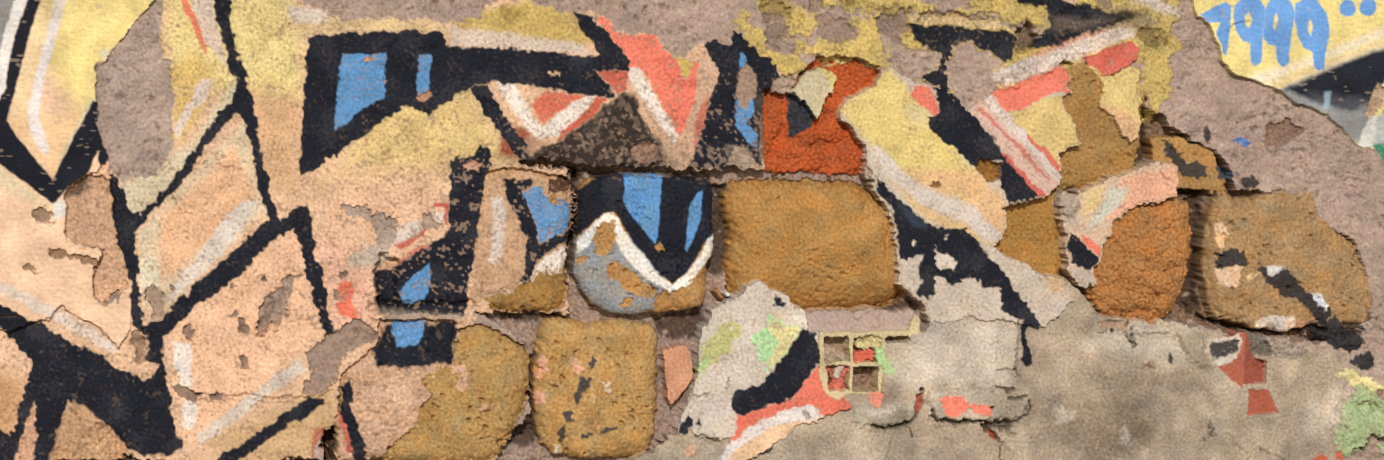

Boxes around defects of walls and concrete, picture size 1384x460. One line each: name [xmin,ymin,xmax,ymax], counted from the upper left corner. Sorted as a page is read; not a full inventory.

peeling [736,64,758,109]
spalling [24,0,176,365]
peeling [341,201,399,251]
spalling [548,172,571,205]
peeling [482,220,707,314]
spalling [976,157,1002,183]
peeling [1088,140,1225,287]
peeling [1214,223,1331,332]
crack [1122,311,1328,346]
peeling [554,356,618,454]
crack [871,319,1032,460]
crack [1226,433,1286,460]